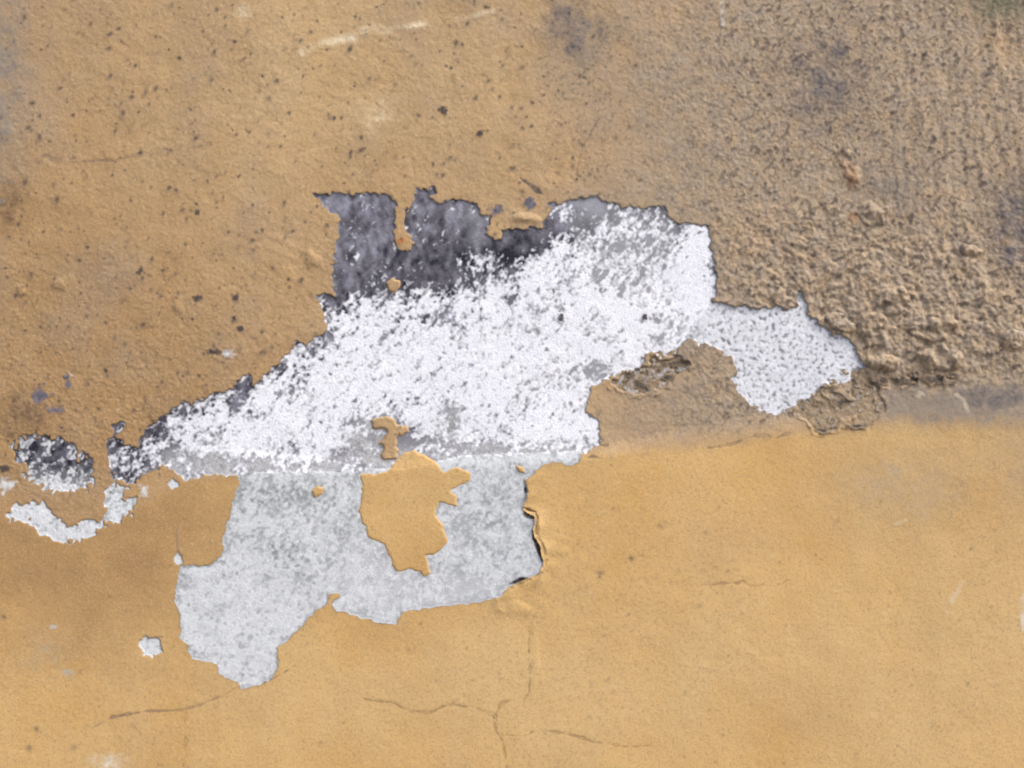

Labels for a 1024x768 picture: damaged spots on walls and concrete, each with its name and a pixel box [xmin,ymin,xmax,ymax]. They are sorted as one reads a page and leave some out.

peeling [0,186,964,690]
crack [93,687,238,767]
crack [263,666,294,684]
crack [363,627,649,768]